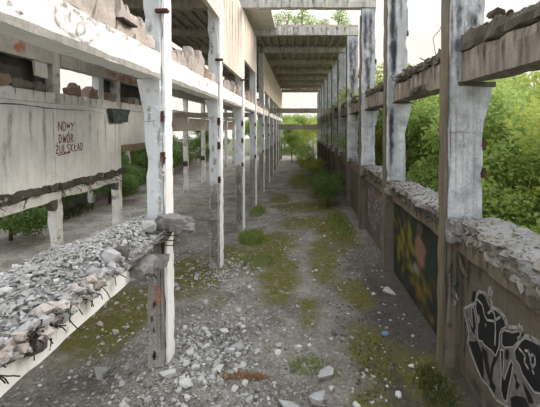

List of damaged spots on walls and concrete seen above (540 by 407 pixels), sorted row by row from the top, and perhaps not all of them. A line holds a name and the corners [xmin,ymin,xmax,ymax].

damp [390,0,402,75]
spalling [390,27,441,82]
spalling [391,180,439,225]
spalling [460,218,540,300]
spalling [0,234,178,368]